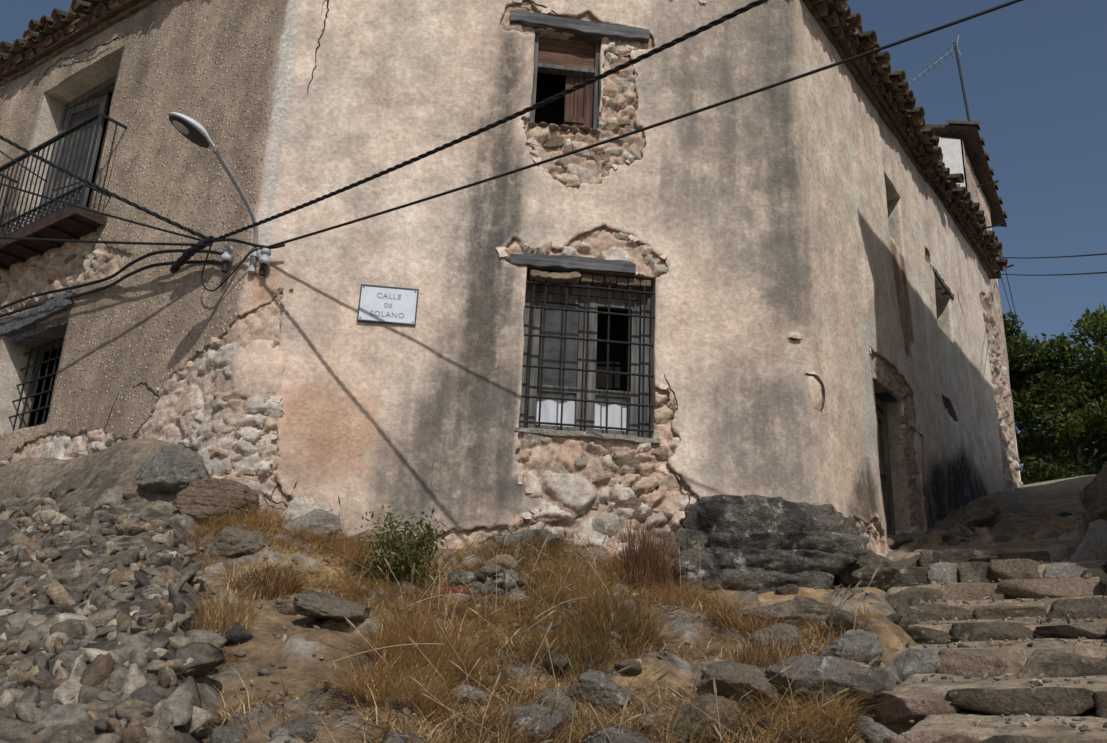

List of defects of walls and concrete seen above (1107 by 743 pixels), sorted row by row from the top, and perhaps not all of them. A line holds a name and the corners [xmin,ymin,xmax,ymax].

crack [307,0,329,92]
spalling [500,0,657,187]
spalling [0,232,133,315]
spalling [0,287,334,520]
leakage [382,143,524,523]
spalling [412,382,703,566]
spalling [495,227,669,292]
spalling [856,347,925,557]
leakage [924,453,987,528]
spalling [980,293,1024,491]